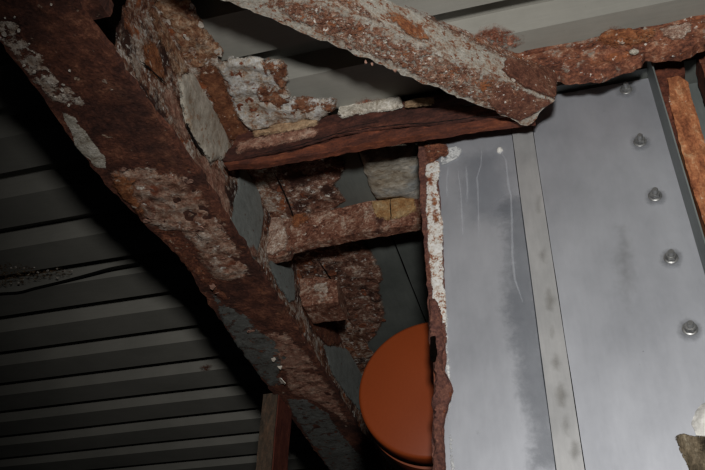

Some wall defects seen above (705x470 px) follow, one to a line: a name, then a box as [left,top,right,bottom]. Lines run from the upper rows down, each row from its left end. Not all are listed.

corrosion [154,0,247,140]
spalling [217,55,337,130]
corrosion [256,0,558,121]
corrosion [423,143,449,163]
efflorescence [441,146,462,165]
corrosion [110,167,250,281]
peeling [425,161,453,470]